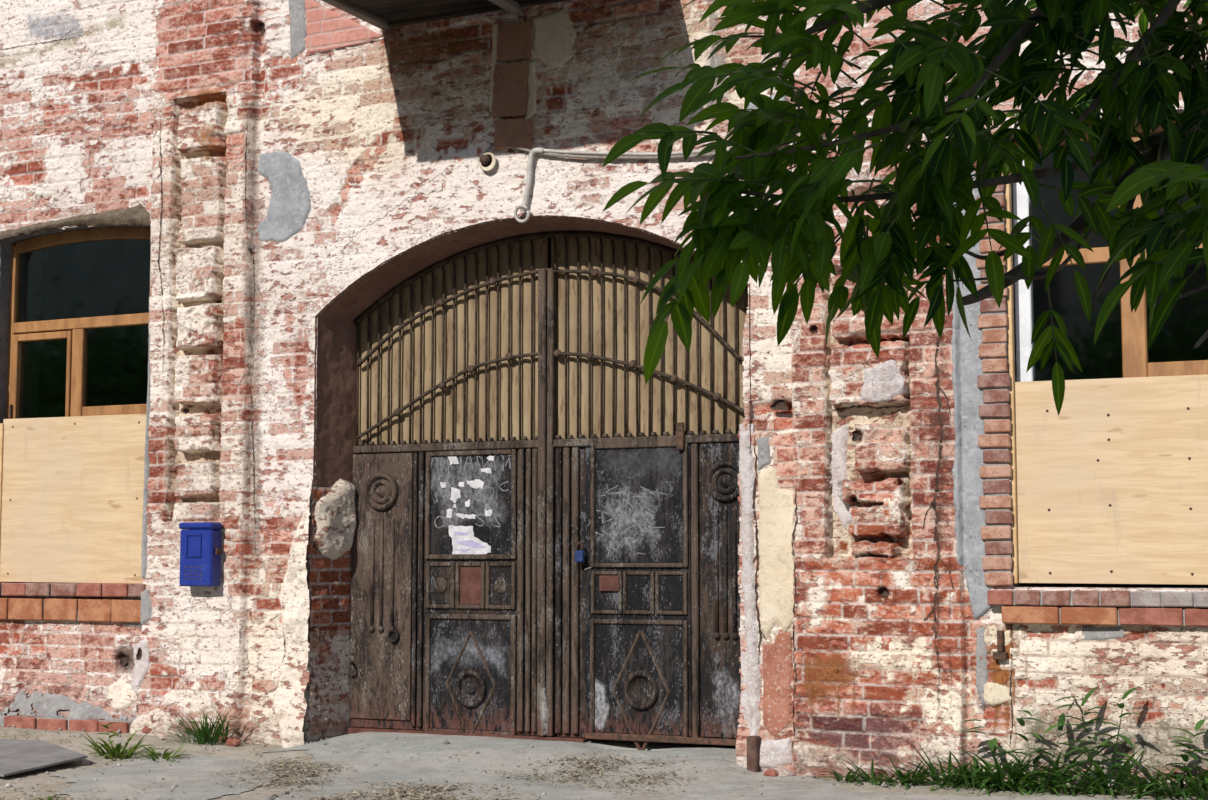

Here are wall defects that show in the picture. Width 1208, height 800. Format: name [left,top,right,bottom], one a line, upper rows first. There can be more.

peeling [0,0,317,239]
peeling [311,101,486,259]
spalling [377,12,505,83]
spalling [533,67,661,173]
peeling [120,499,310,720]
corrosion [804,656,858,716]
crack [922,330,954,702]
spalling [738,259,1208,784]